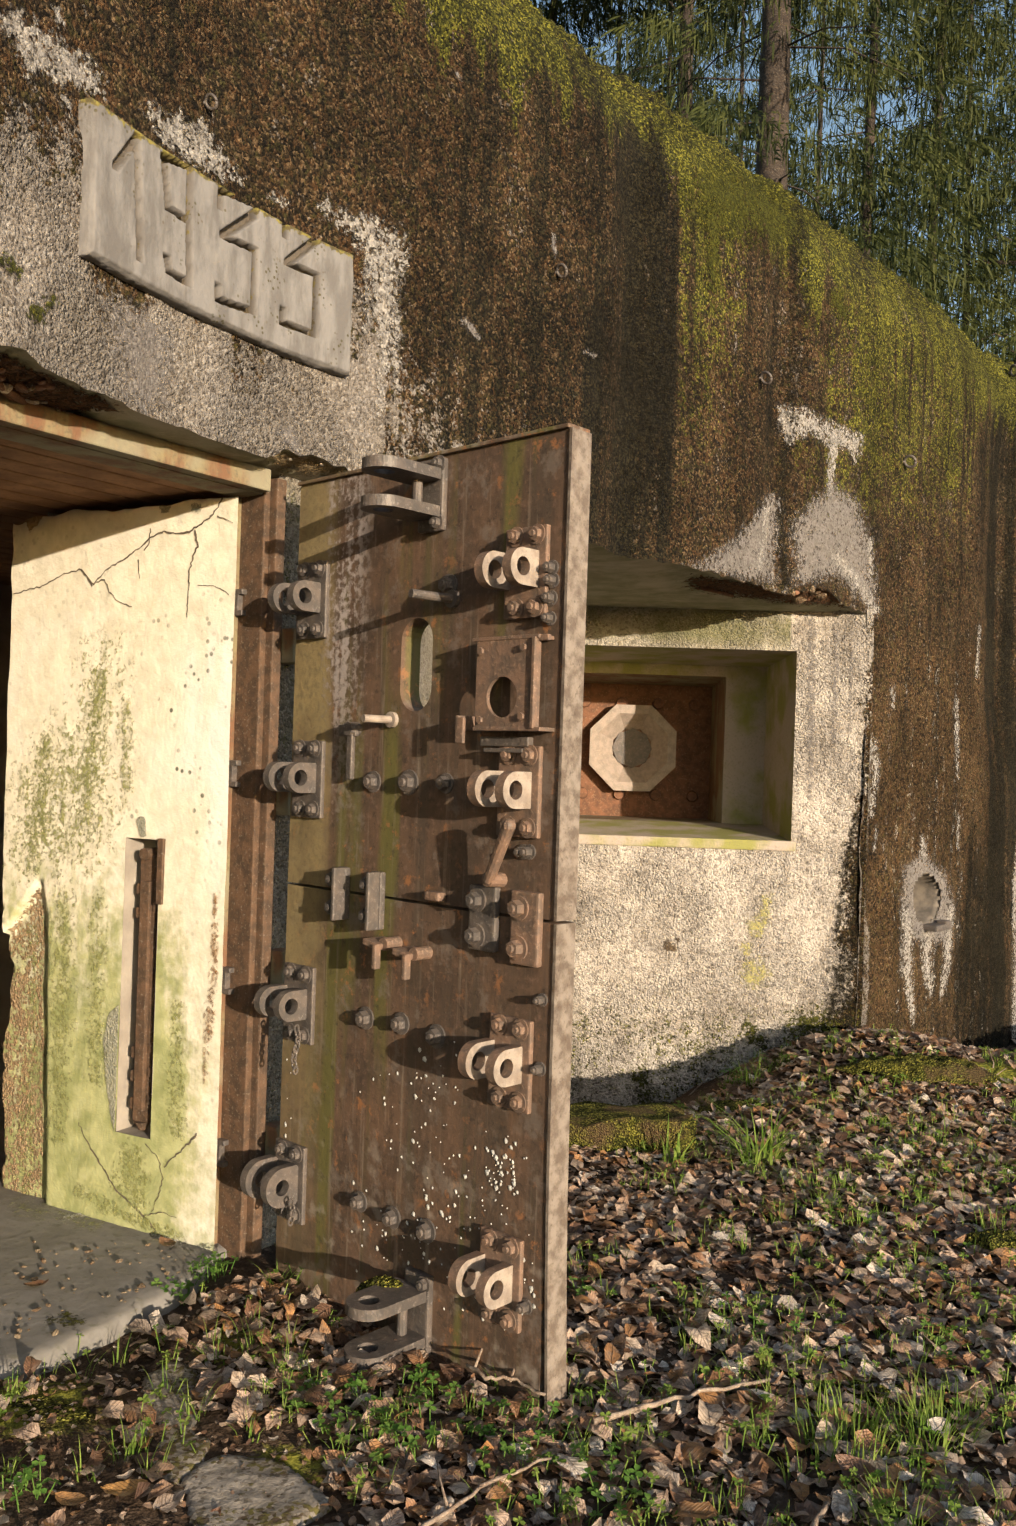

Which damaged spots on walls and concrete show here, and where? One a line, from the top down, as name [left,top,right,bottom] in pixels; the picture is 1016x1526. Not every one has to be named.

damp [0,7,107,118]
damp [147,101,244,186]
spalling [0,353,124,416]
damp [692,210,882,616]
crack [13,498,231,615]
spalling [681,573,848,609]
damp [26,733,52,871]
damp [81,669,133,825]
damp [899,395,1016,1048]
spalling [1,888,46,1198]